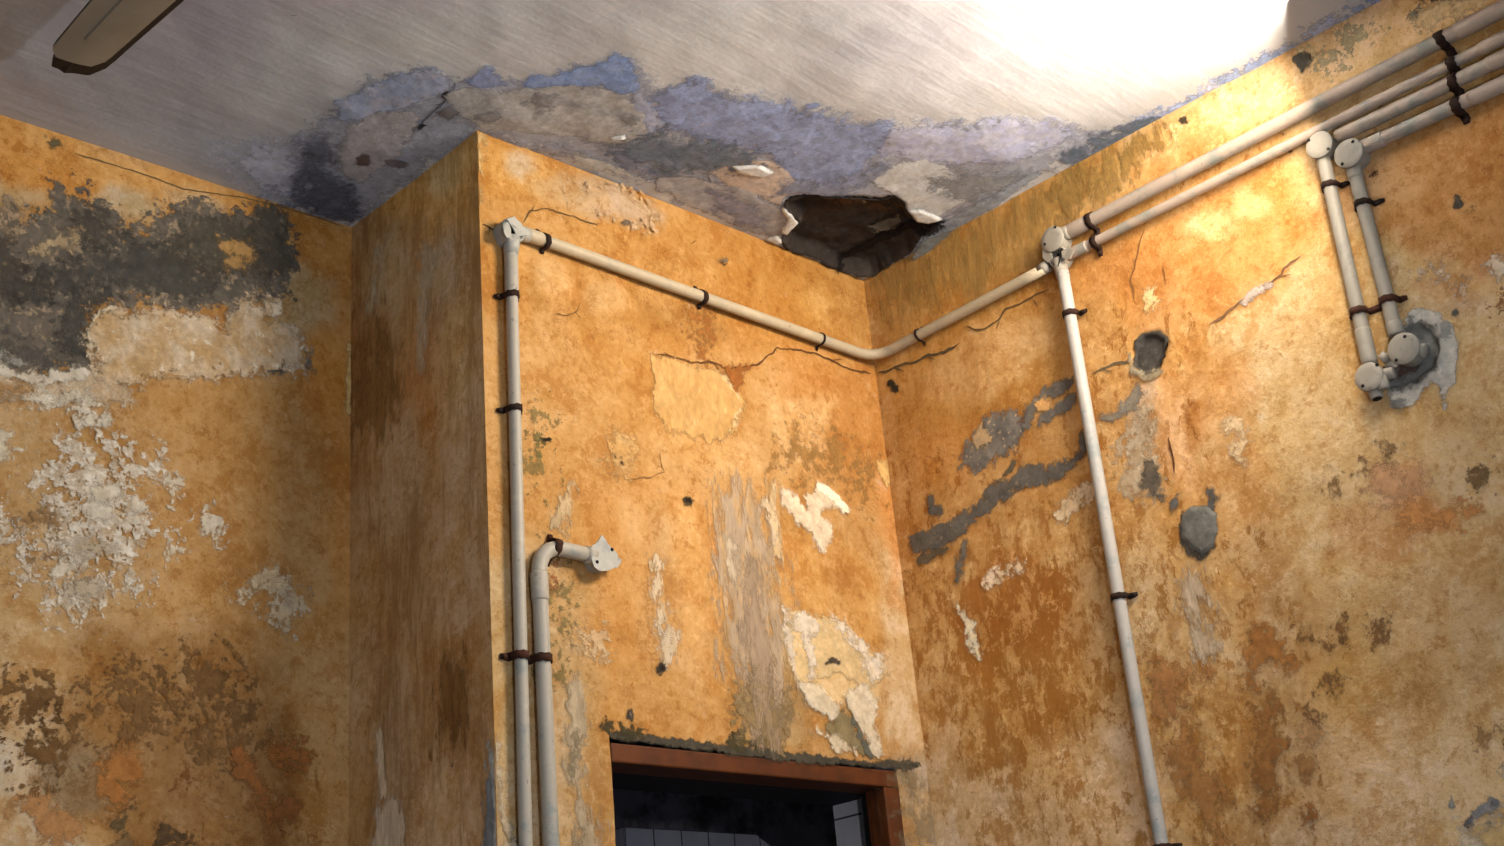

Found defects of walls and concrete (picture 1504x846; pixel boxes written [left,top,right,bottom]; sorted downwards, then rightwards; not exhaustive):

peeling [208,52,1111,278]
damp [0,133,366,799]
damp [350,296,404,446]
peeling [650,353,746,445]
damp [706,414,889,758]
peeling [779,481,850,553]
crack [658,289,1048,374]
peeling [909,376,1087,584]
spalling [1383,254,1504,411]
damp [429,644,469,768]
peeling [781,605,890,759]
damp [108,796,203,846]